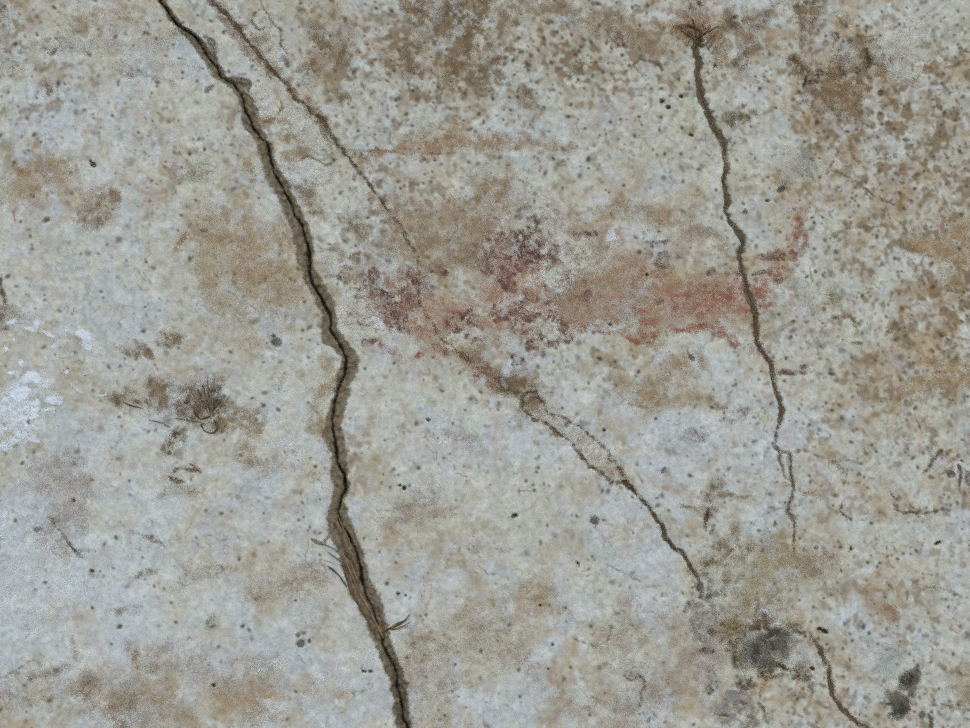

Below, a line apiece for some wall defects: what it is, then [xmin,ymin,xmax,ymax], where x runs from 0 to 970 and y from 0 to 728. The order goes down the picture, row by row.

crack [158,0,716,728]
crack [691,38,860,552]
crack [793,630,872,728]
crack [926,703,970,728]